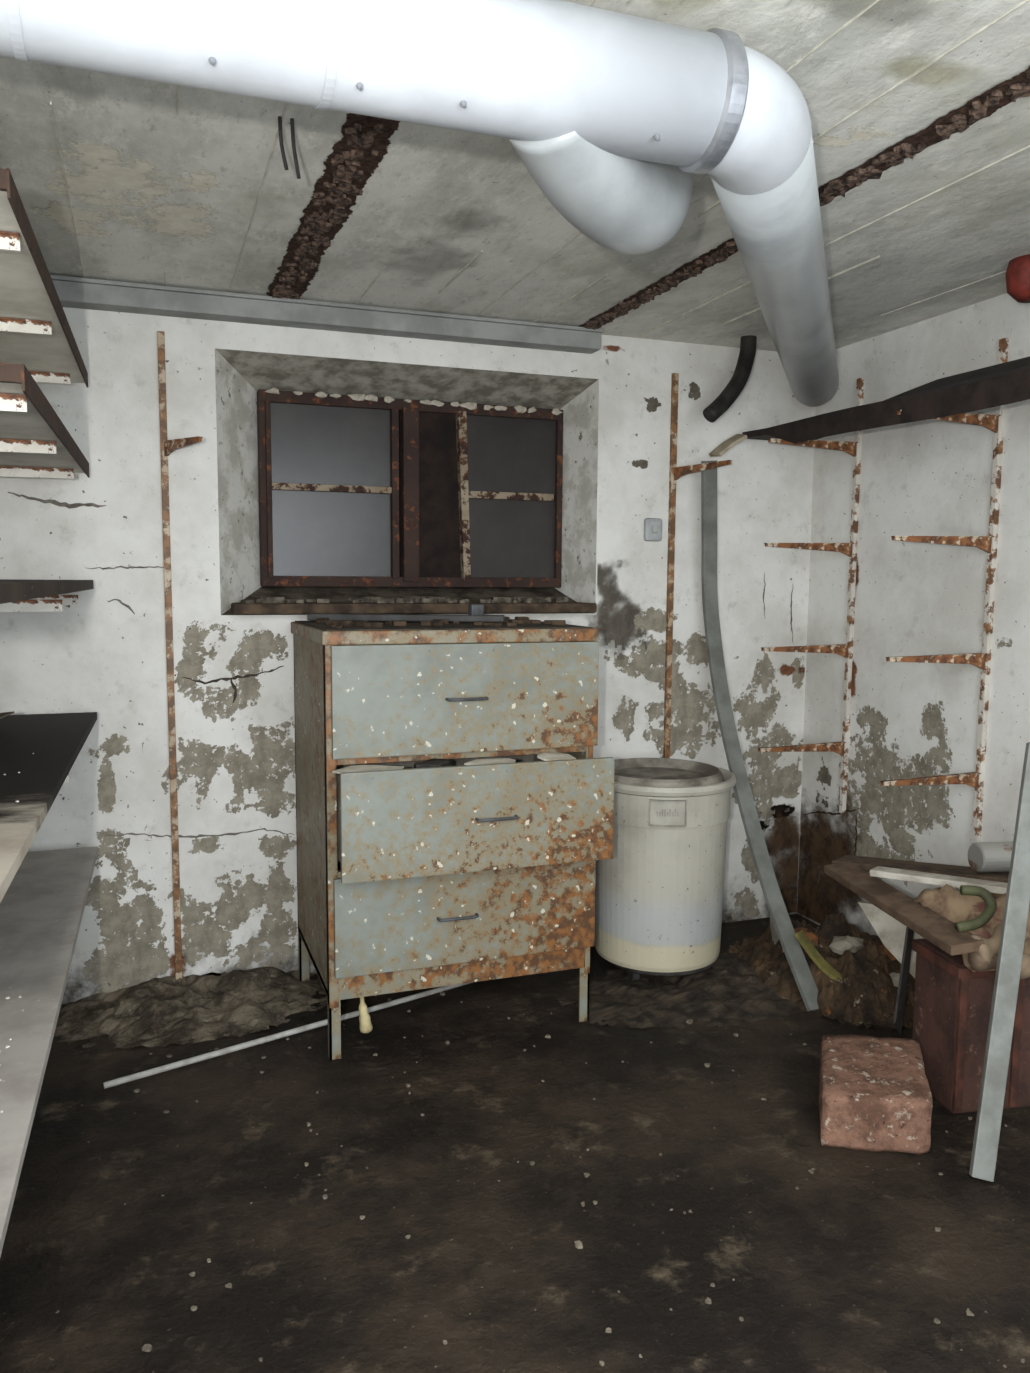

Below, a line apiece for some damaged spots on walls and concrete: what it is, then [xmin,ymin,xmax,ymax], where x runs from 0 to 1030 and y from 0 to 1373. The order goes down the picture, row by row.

crack [8,492,106,509]
crack [181,666,283,703]
peeling [604,604,721,759]
rust [780,665,805,676]
peeling [732,651,954,861]
peeling [82,620,298,993]
peeling [731,839,760,920]
rust [170,955,186,976]